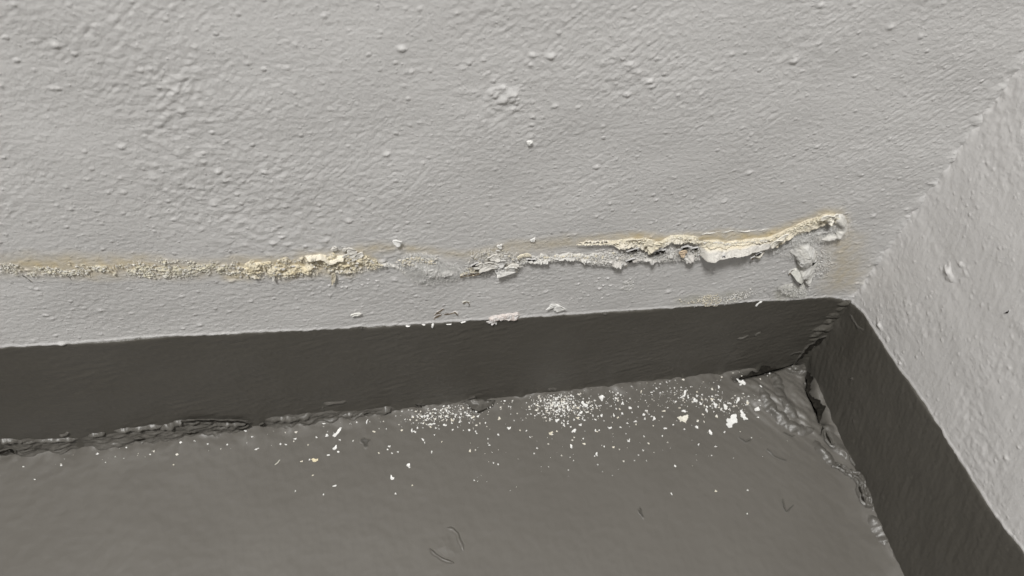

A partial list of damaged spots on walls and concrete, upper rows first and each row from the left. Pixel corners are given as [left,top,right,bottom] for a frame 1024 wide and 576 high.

peeling [236,246,384,285]
leakage [0,204,879,309]
peeling [460,244,525,279]
peeling [576,213,857,263]